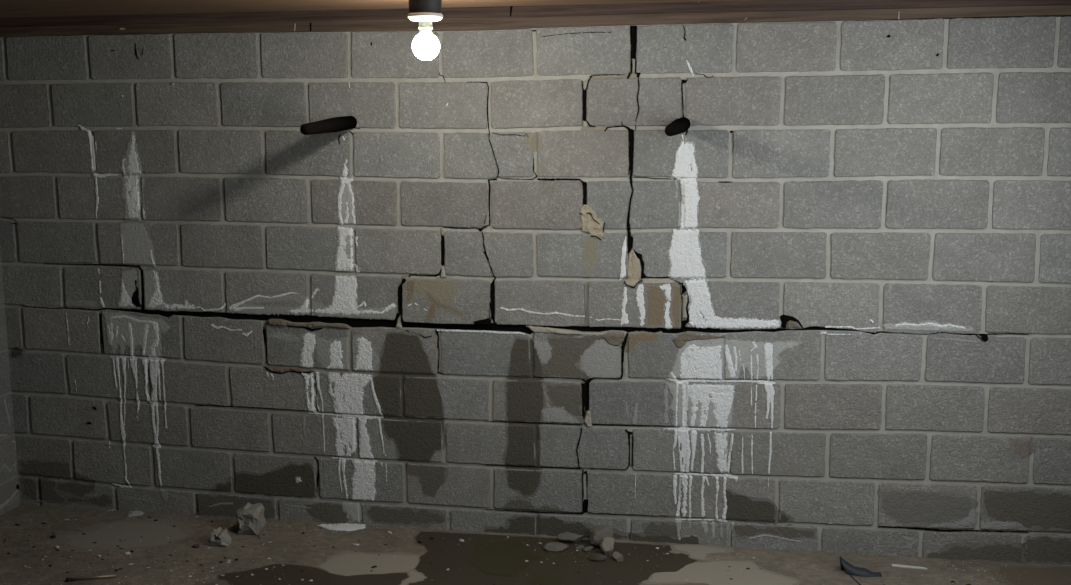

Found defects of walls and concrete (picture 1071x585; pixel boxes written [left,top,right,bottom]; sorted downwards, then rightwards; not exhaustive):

spalling [580,205,604,239]
crack [24,25,1029,517]
spalling [625,249,675,287]
leakage [48,125,816,585]
spalling [673,332,725,349]
crack [878,525,1029,533]